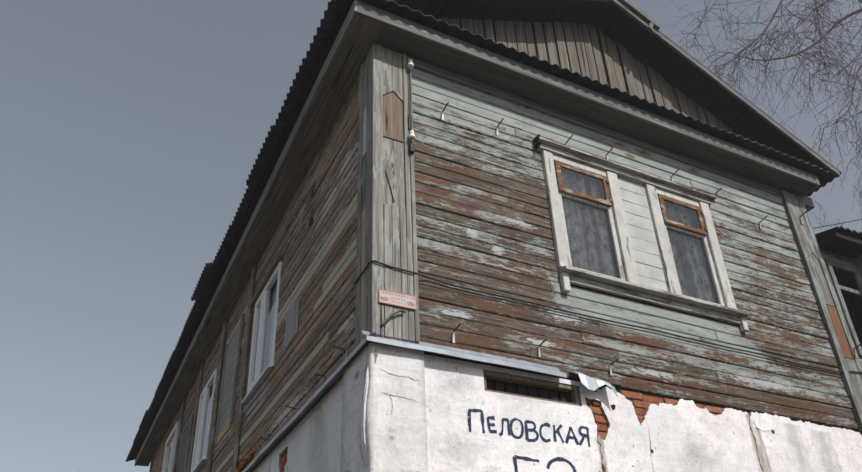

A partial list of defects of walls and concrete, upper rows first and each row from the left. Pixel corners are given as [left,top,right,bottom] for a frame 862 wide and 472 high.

flaking render [586,391,614,446]
flaking render [619,367,731,423]
flaking render [280,449,288,472]